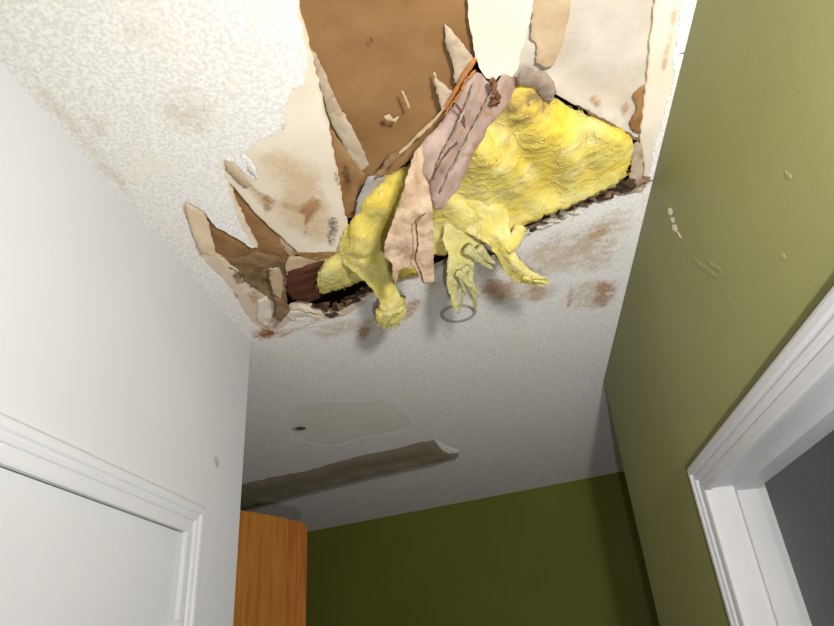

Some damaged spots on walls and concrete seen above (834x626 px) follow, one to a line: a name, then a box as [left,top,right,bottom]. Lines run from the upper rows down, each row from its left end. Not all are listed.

peeling [182,201,366,331]
peeling [221,9,347,253]
damp [300,201,319,224]
peeling [574,0,681,208]